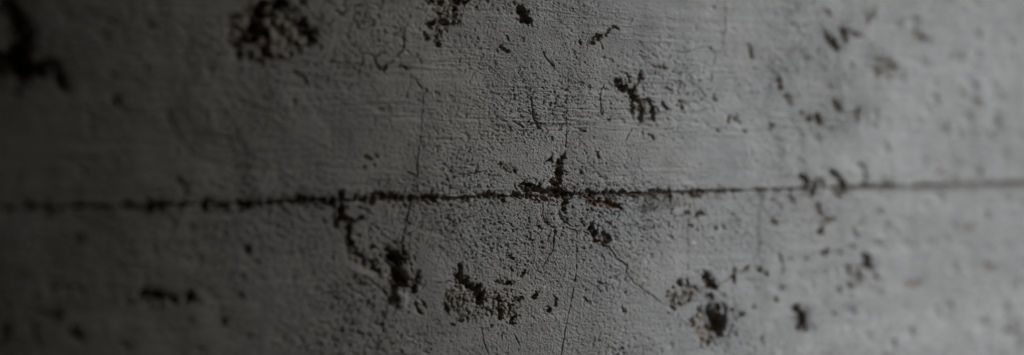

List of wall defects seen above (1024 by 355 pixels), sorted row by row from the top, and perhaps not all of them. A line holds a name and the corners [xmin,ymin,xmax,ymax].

spalling [218,0,323,68]
spalling [421,0,472,48]
spalling [607,63,685,141]
crack [541,200,579,355]
crack [605,245,667,306]
crack [682,202,718,278]
spalling [665,264,770,347]
crack [773,251,793,303]